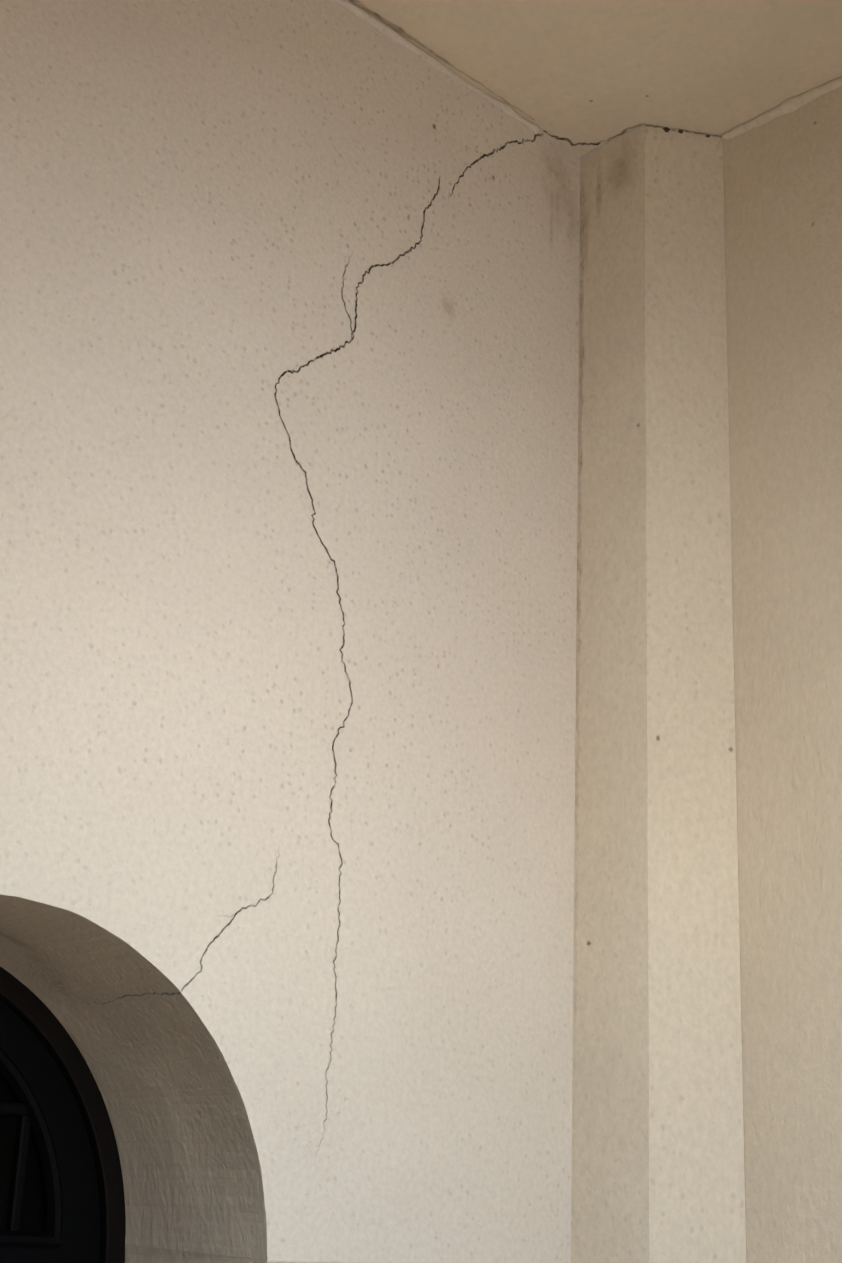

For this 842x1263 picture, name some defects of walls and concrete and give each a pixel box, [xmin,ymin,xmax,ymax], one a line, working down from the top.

crack [124,877,275,997]
crack [274,123,721,1114]